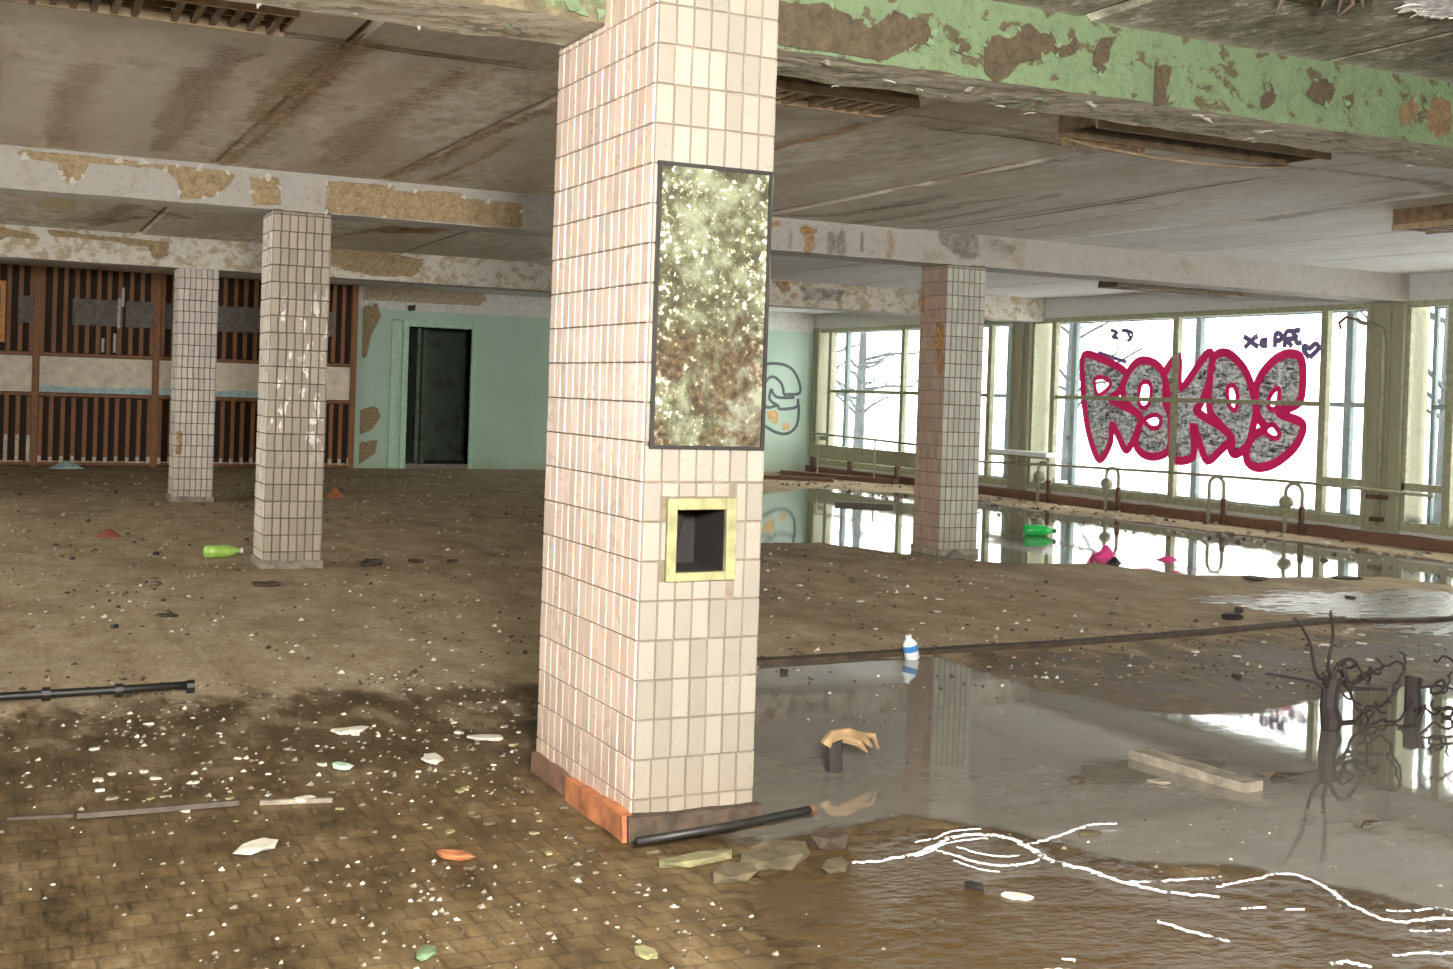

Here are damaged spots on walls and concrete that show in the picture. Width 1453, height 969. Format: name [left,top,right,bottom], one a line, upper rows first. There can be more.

damp [211,40,376,164]
damp [385,109,548,180]
peeling [17,148,282,206]
peeling [325,181,524,228]
peeling [0,227,170,260]
peeling [359,404,381,464]